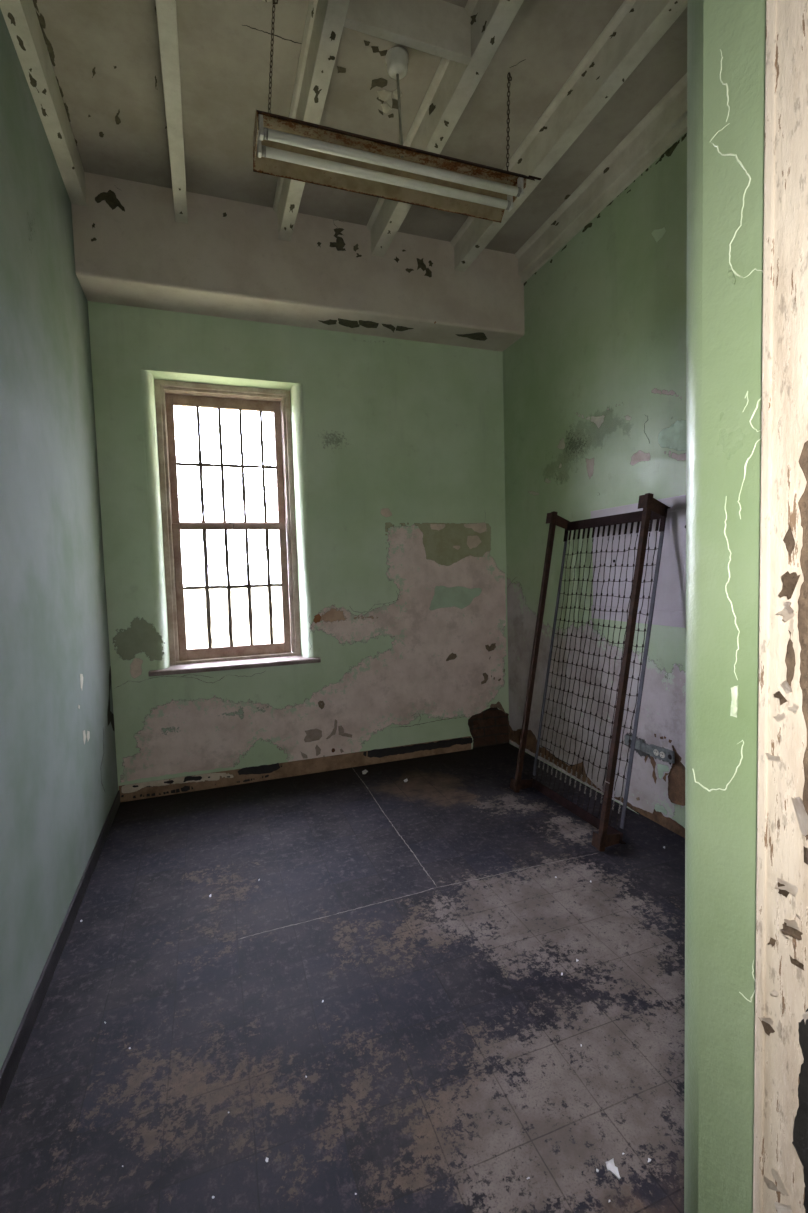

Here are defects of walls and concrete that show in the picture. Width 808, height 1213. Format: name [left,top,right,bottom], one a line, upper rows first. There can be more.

peeling [29,0,77,146]
peeling [313,56,346,103]
crack [711,49,763,278]
peeling [95,190,125,211]
peeling [317,228,362,257]
peeling [318,318,414,333]
peeling [120,524,686,838]
peeling [773,441,808,865]
peeling [775,877,798,898]
peeling [767,914,804,970]
peeling [758,1017,775,1036]
peeling [763,1009,808,1213]